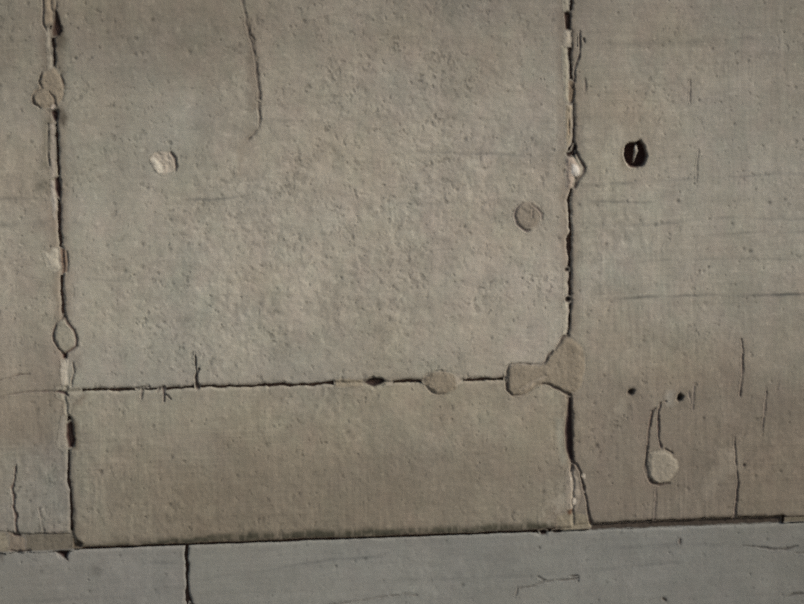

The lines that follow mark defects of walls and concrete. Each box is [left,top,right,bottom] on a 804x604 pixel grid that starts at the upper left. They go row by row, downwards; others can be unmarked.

crack [39,0,47,32]
crack [240,0,263,142]
crack [567,30,588,135]
crack [30,71,67,168]
crack [63,249,71,274]
crack [135,385,172,403]
crack [422,370,448,397]
crack [569,461,594,526]
crack [642,400,674,524]